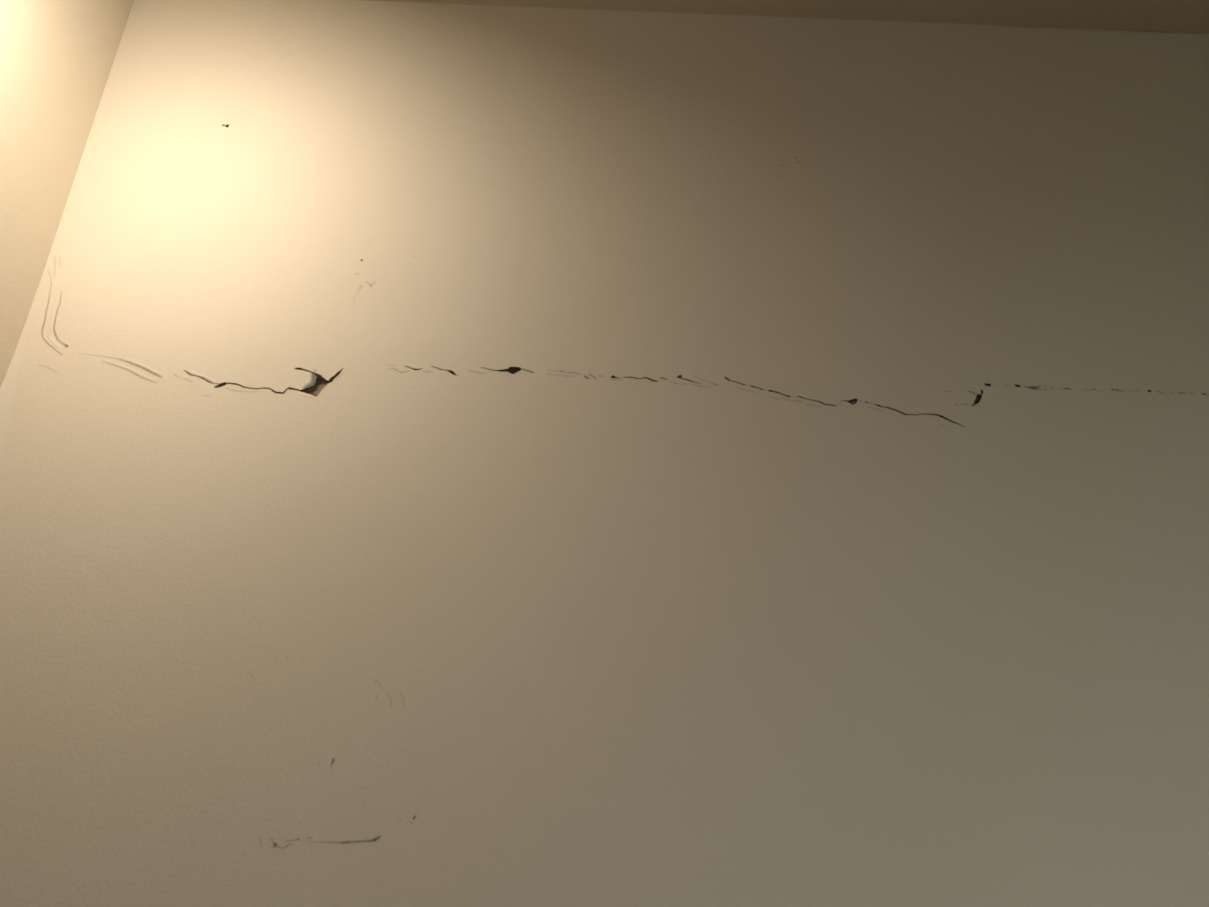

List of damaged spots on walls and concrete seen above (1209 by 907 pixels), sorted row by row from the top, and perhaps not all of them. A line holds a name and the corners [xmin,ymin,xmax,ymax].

crack [185,370,287,394]
spalling [288,368,344,399]
crack [611,375,691,384]
crack [725,377,835,406]
crack [866,402,956,426]